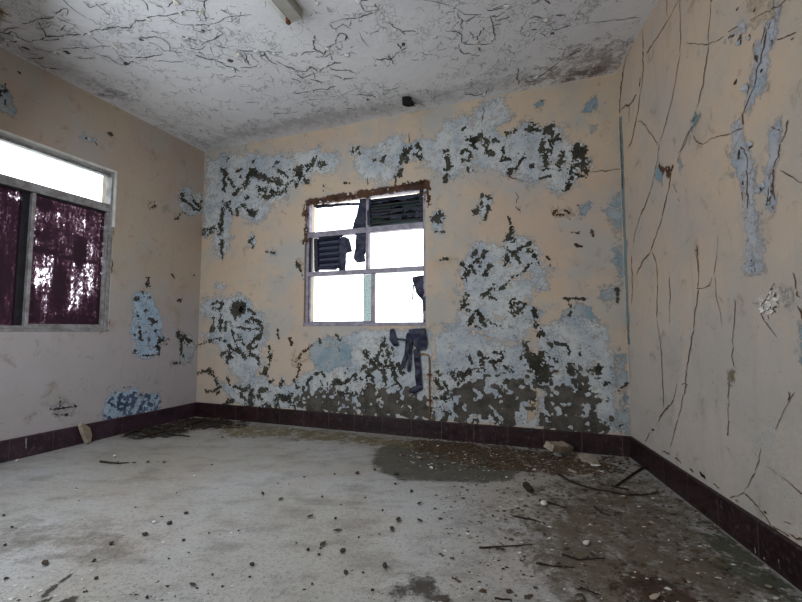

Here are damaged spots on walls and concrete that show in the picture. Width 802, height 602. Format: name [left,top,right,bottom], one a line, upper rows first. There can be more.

peeling [102,386,162,420]
crack [0,0,416,114]
peeling [130,216,631,435]
peeling [174,95,594,264]
crack [425,0,511,54]
crack [516,49,581,84]
peeling [600,117,630,344]
crack [530,0,802,540]
peeling [724,0,783,276]